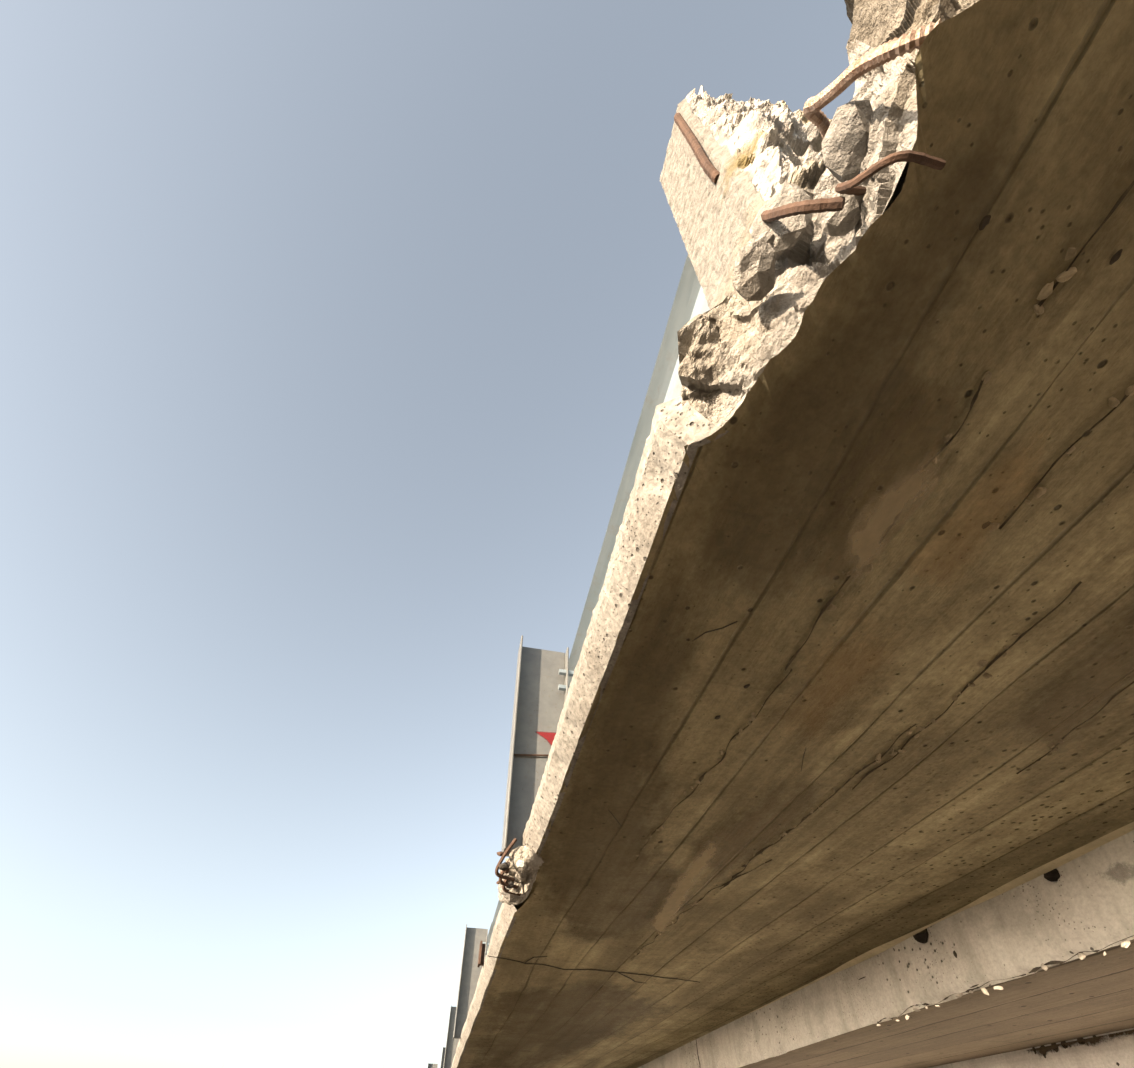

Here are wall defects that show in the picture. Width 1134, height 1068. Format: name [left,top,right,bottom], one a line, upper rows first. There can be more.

spalling [674,0,979,428]
peeling [1033,247,1077,315]
spalling [495,838,544,905]